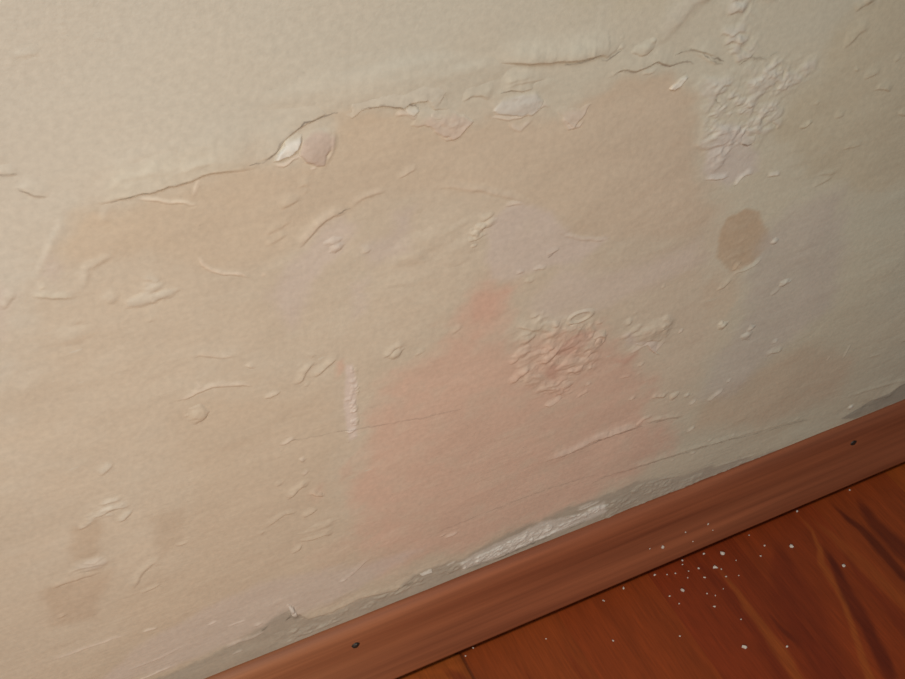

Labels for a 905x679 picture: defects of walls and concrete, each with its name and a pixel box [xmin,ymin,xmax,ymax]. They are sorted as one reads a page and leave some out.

peeling [249,106,339,175]